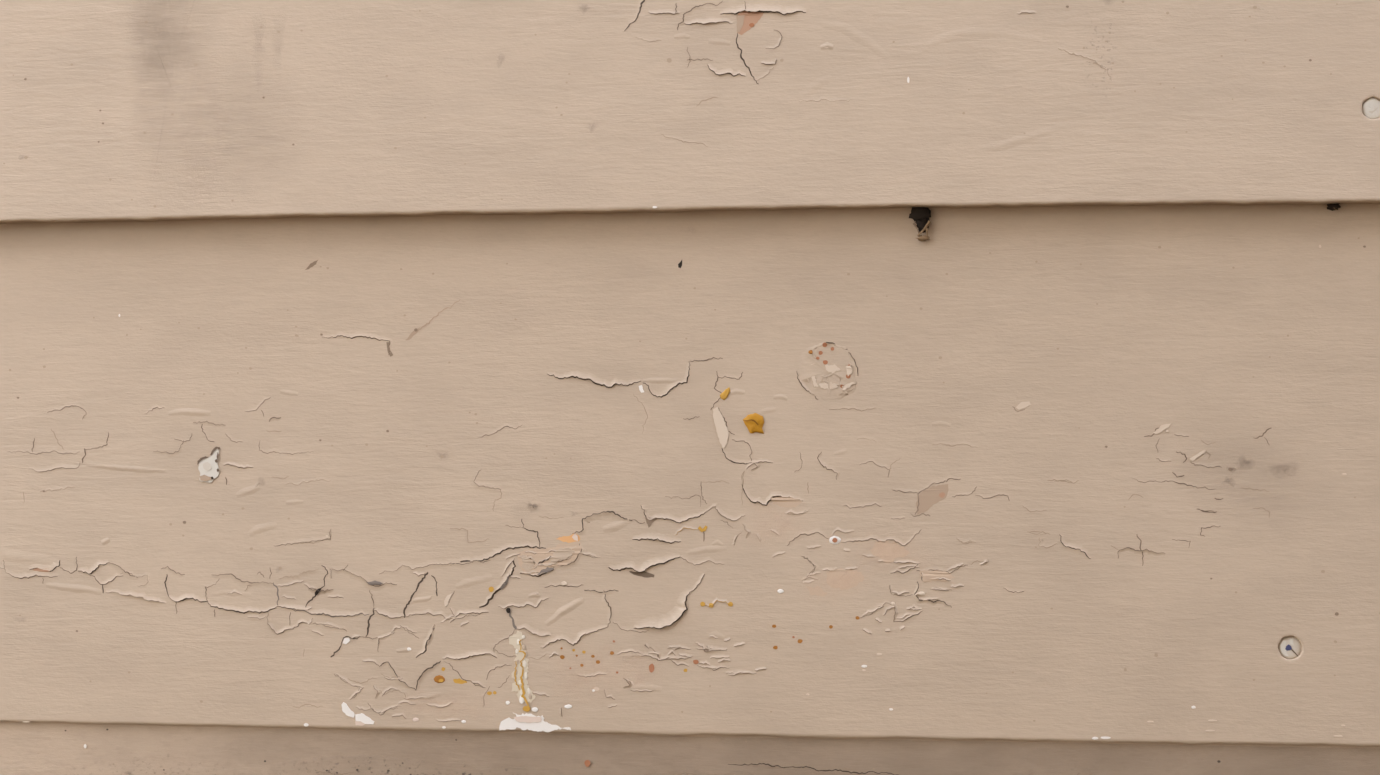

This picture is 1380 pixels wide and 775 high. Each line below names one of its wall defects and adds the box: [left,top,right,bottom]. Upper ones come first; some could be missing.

peeling [737,11,763,35]
crack [322,332,393,357]
peeling [811,364,856,391]
peeling [713,407,729,449]
crack [1029,428,1270,566]
crack [0,357,1024,722]
peeling [517,533,582,585]
peeling [499,635,571,733]
peeling [342,702,374,726]